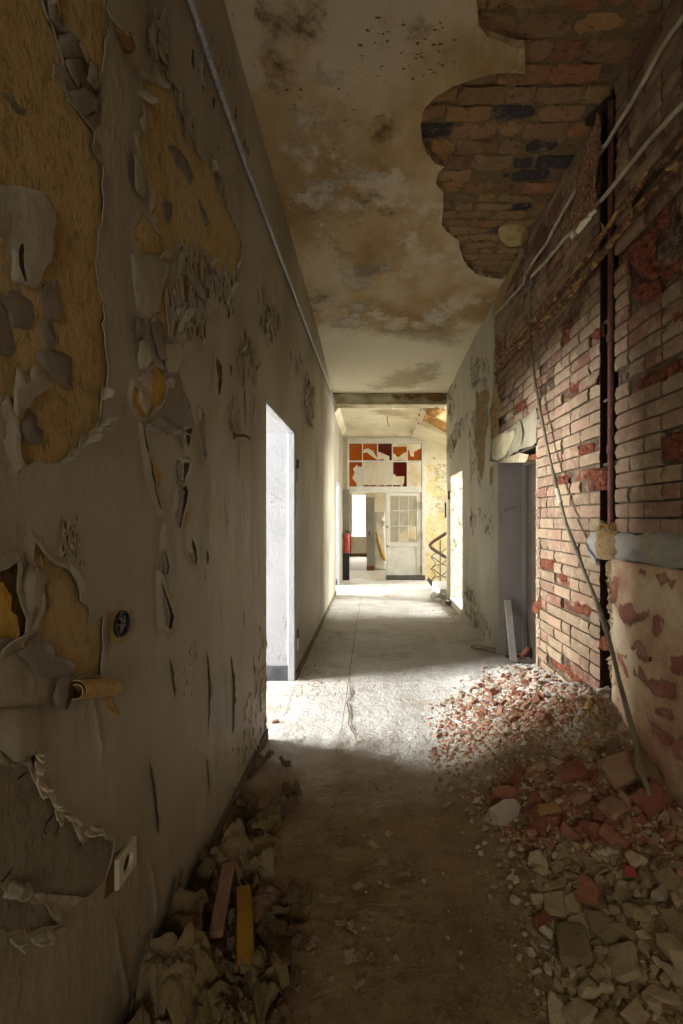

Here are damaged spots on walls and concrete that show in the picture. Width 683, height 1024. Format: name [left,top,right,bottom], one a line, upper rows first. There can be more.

peeling [0,0,242,518]
flaking render [351,0,683,690]
peeling [0,748,117,912]
peeling [0,514,123,718]